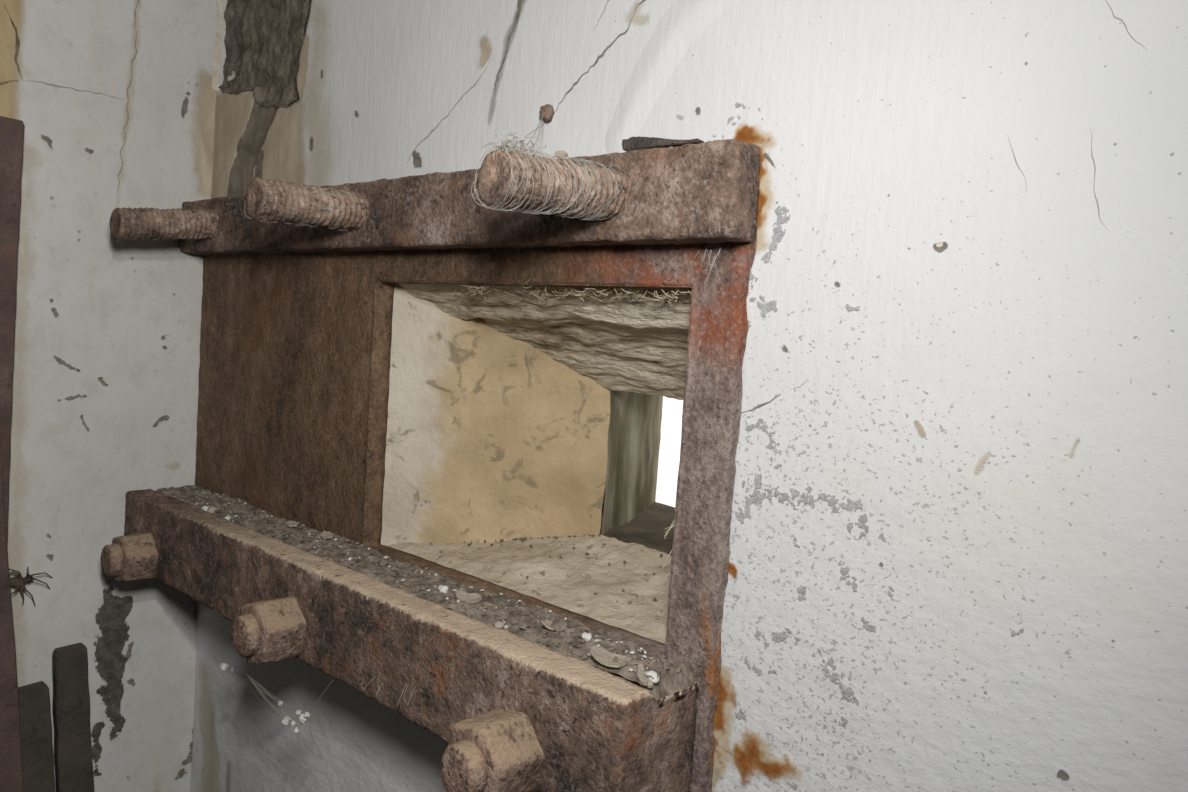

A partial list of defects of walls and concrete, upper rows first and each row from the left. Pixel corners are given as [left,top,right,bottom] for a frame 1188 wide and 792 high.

rust [712,668,793,784]